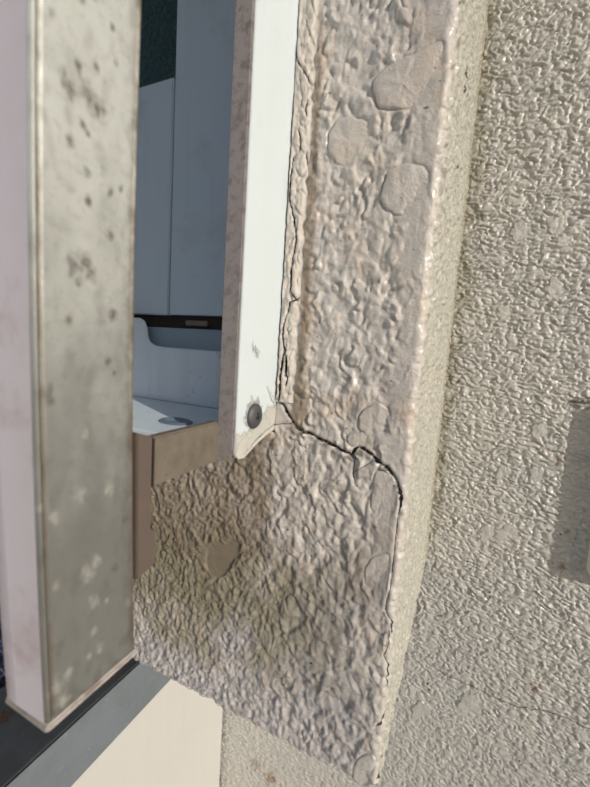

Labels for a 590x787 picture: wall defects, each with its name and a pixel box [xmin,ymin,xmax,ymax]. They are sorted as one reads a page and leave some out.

crack [274,40,403,686]
crack [436,669,589,729]